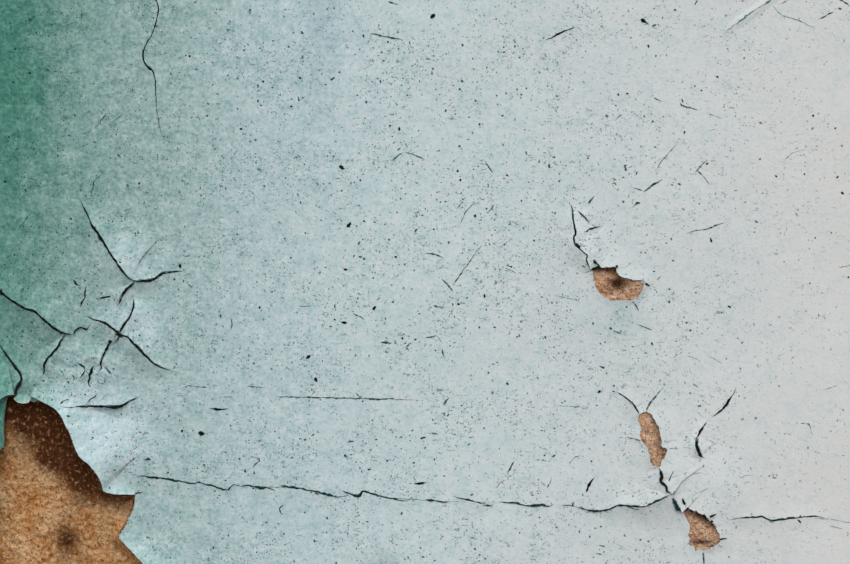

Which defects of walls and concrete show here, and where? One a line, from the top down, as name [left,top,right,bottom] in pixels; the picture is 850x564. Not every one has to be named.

crack [130,0,182,142]
crack [0,172,226,418]
spalling [586,244,658,307]
spalling [0,356,191,564]
crack [126,387,736,564]
spalling [623,398,689,474]
spalling [679,490,737,556]
crack [710,502,850,540]